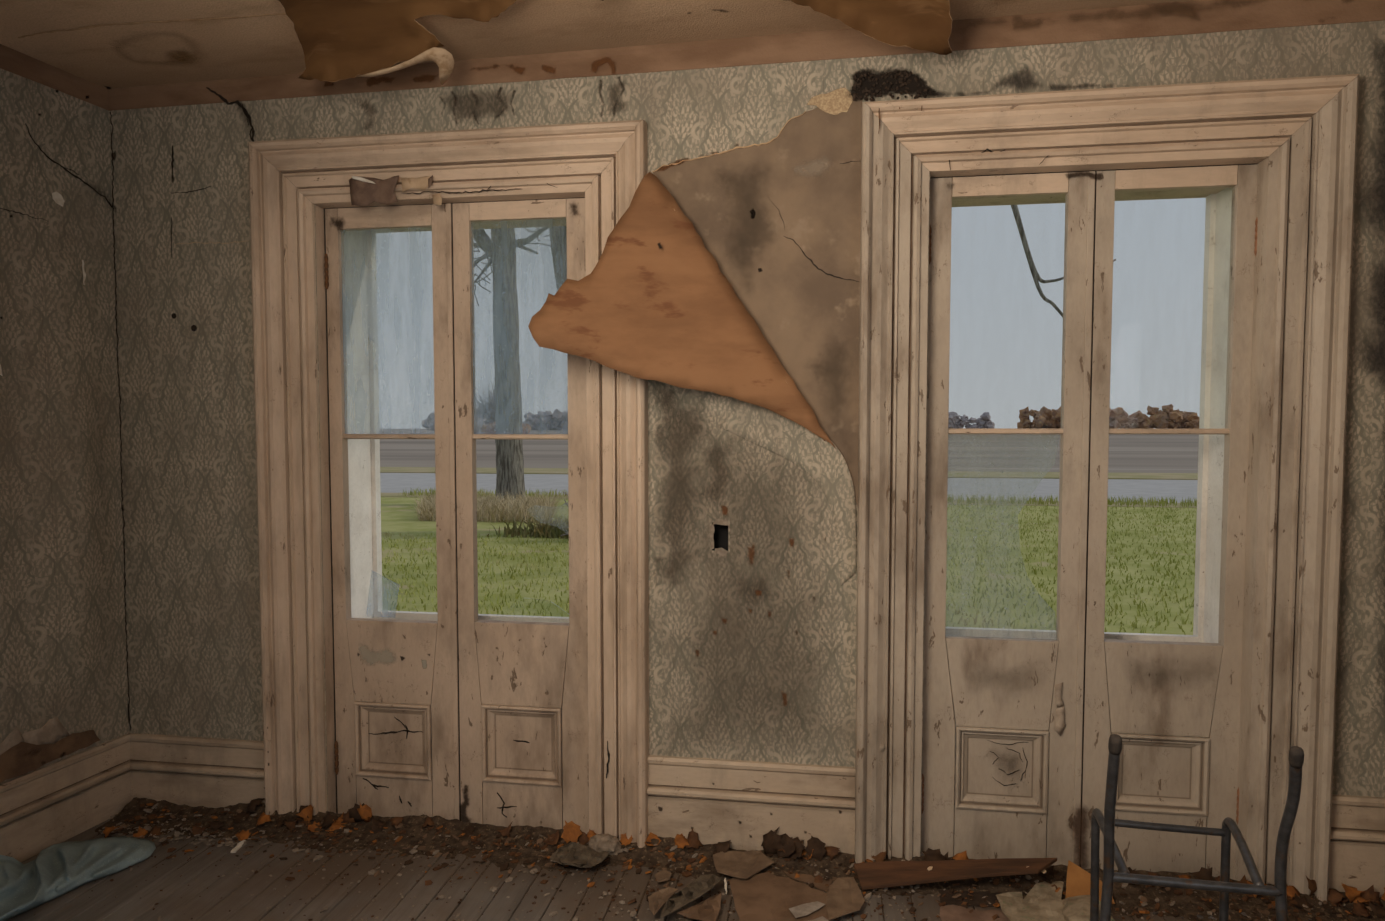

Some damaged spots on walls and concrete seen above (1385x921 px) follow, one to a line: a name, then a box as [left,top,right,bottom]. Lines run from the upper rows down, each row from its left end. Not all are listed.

crack [206,87,255,142]
leakage [441,88,515,123]
leakage [849,68,964,134]
crack [25,123,112,208]
leakage [1367,140,1385,236]
flaking render [528,87,863,586]
leakage [1366,266,1385,382]